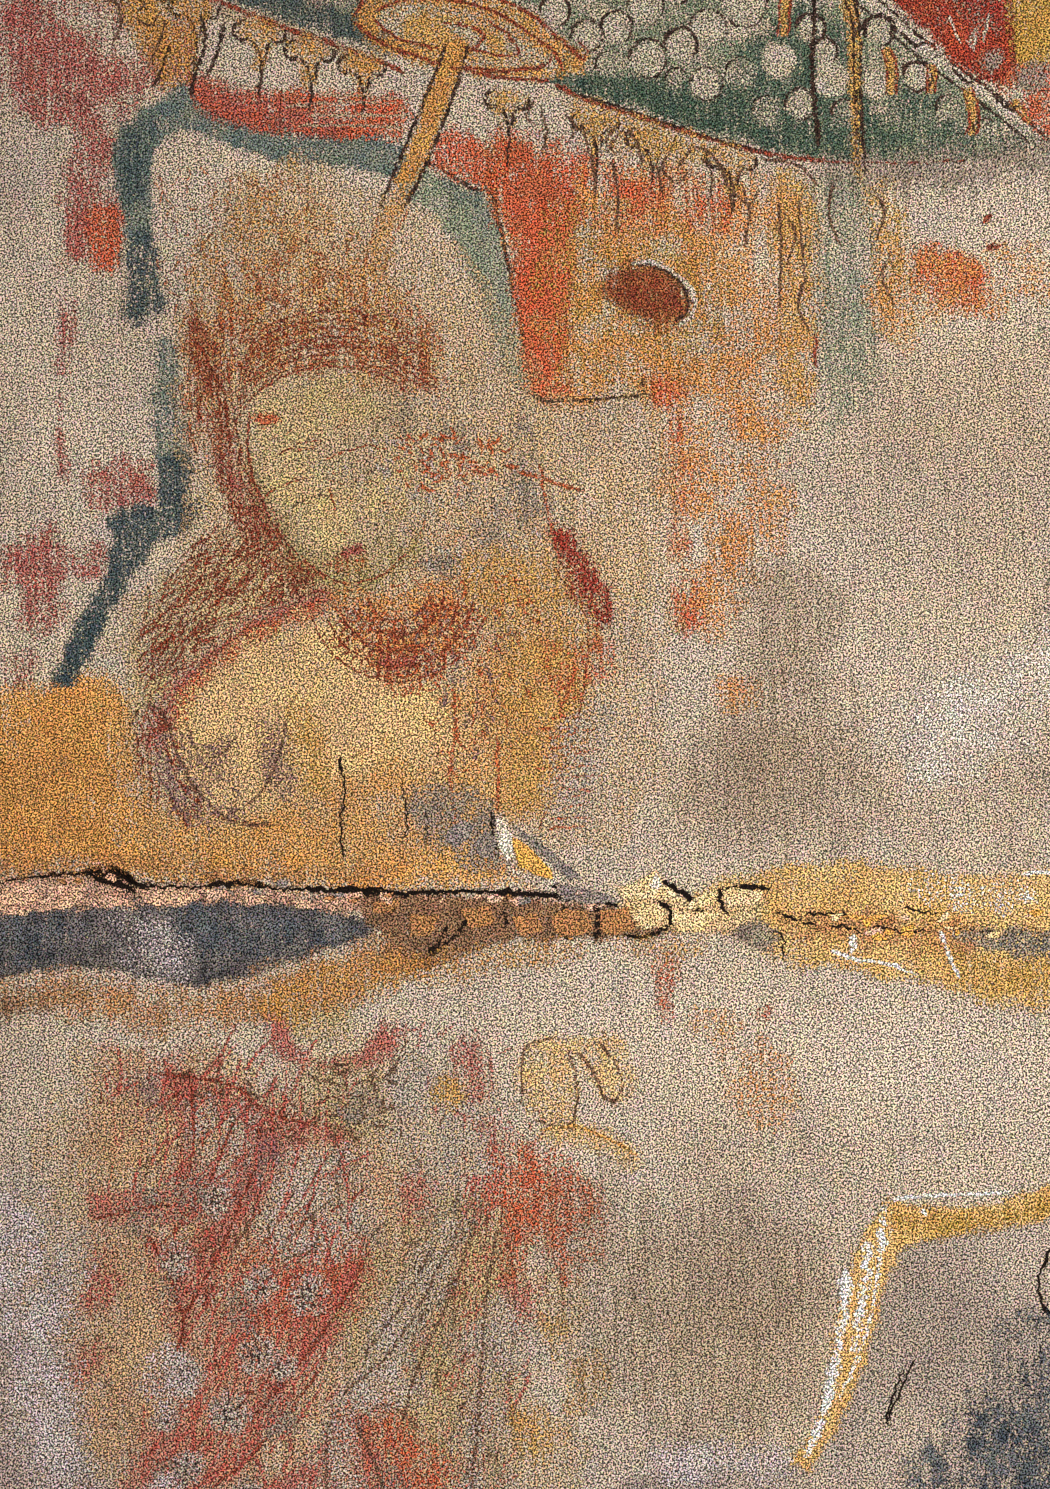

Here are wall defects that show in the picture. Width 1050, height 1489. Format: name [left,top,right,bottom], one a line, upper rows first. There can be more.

crack [0,756,770,939]
flaking render [0,778,782,993]
crack [807,908,916,975]
crack [939,931,960,978]
crack [1037,1249,1050,1314]